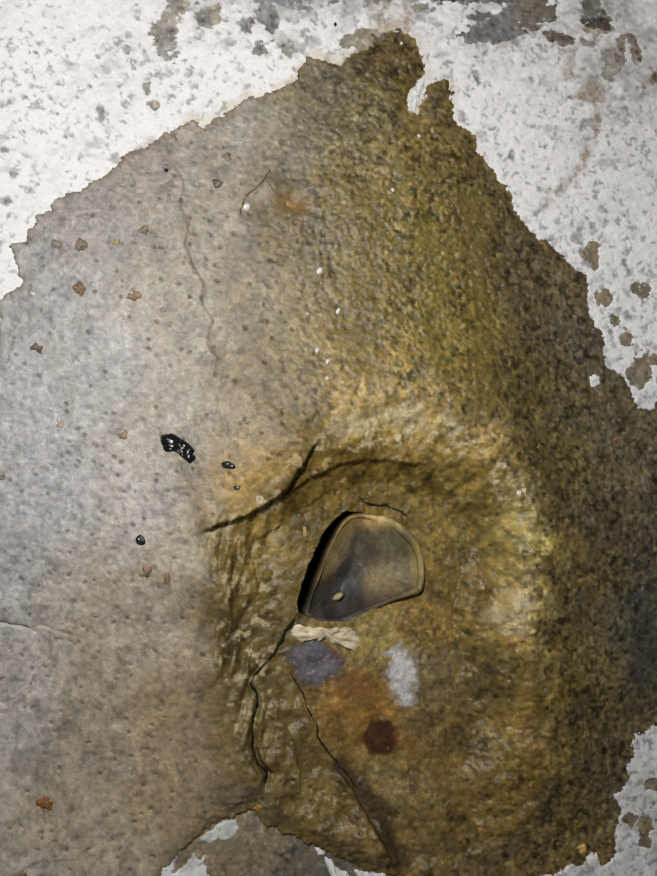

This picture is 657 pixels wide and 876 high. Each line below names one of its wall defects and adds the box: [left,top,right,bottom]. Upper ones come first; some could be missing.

peeling [148,0,222,64]
peeling [408,0,643,82]
spalling [405,77,657,412]
spalling [0,27,425,876]
crack [208,469,301,594]
crack [358,496,407,517]
leakage [246,44,657,874]
leakage [222,614,269,647]
leakage [226,647,272,684]
crack [238,612,304,797]
crack [290,673,358,789]
corrosion [191,400,550,874]